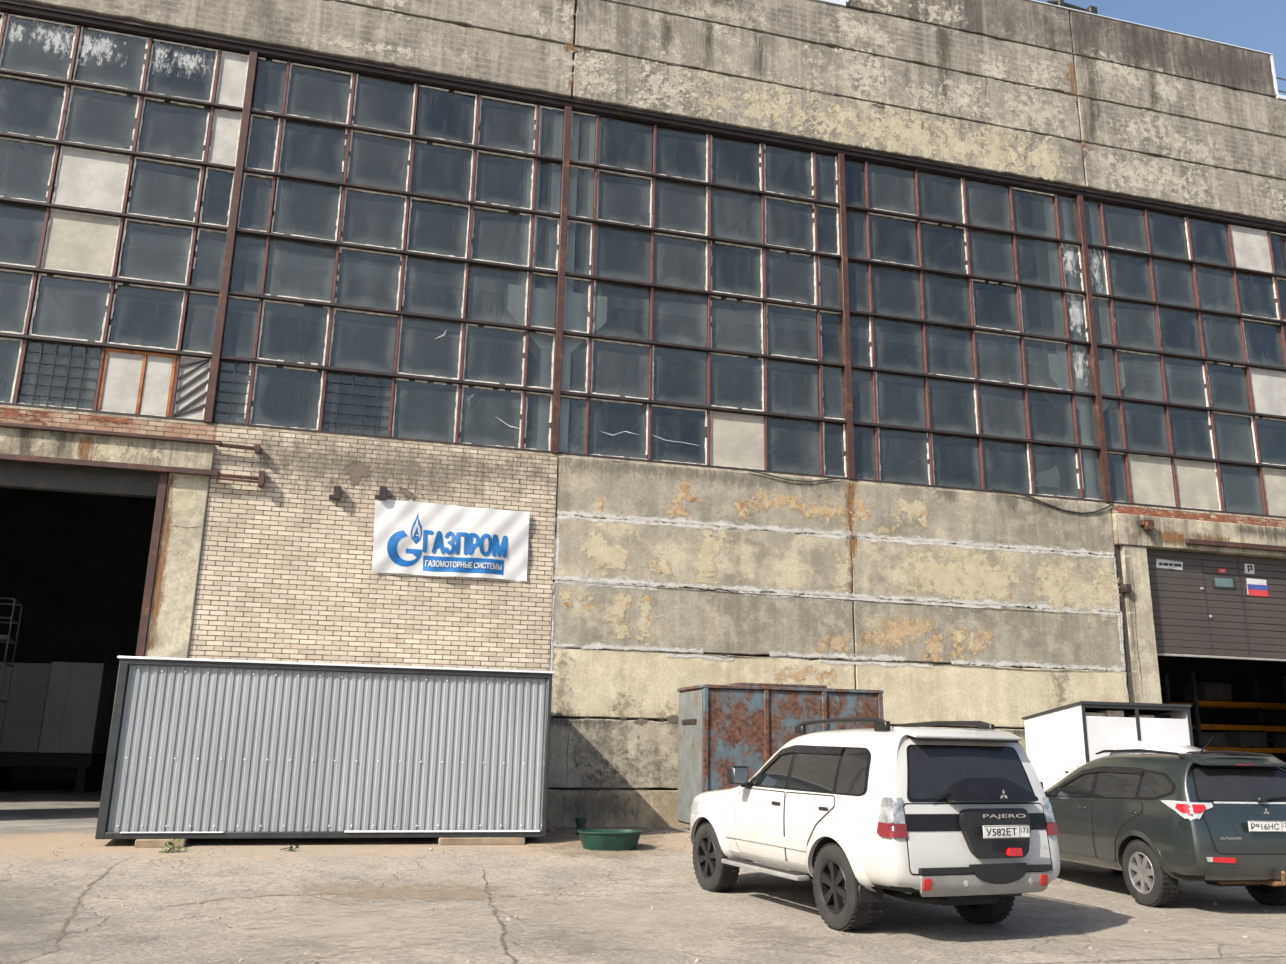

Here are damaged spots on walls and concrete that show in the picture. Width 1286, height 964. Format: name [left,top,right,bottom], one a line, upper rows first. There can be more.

peeling [559,481,733,642]
rust [846,482,857,591]
peeling [733,490,1121,685]